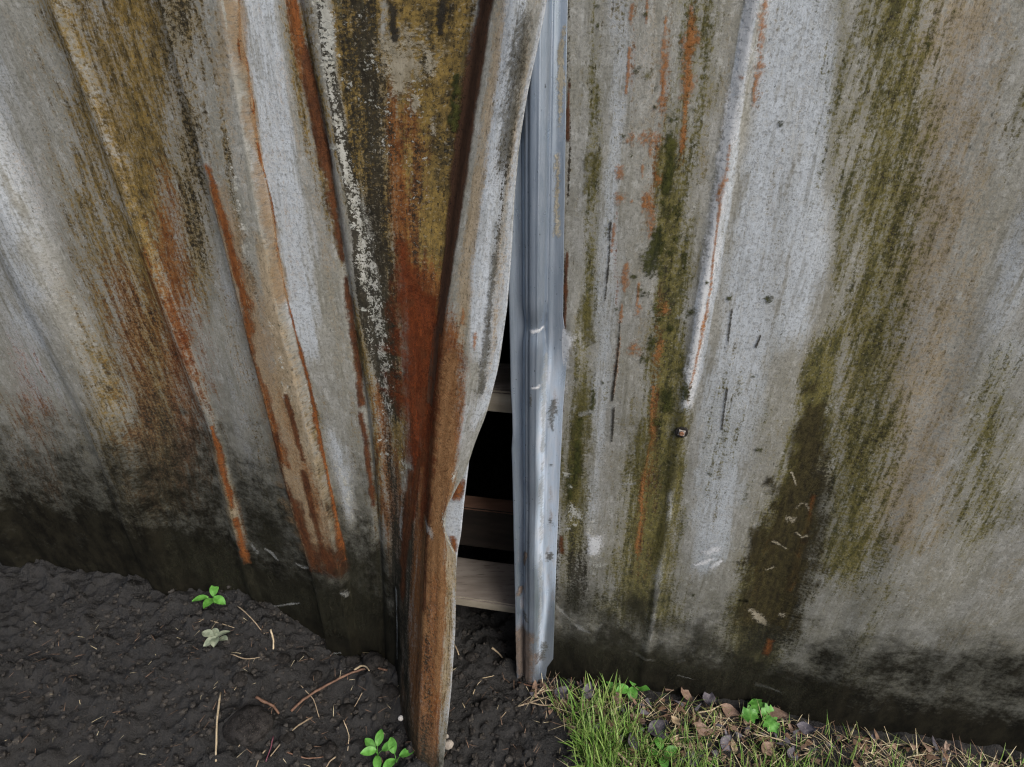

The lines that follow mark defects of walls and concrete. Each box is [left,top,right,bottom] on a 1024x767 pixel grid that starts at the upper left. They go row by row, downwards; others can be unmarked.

water stain [386,0,400,42]
rust [658,18,668,107]
rust [680,8,700,152]
rust [205,0,350,578]
rust [344,277,375,506]
rust [385,0,494,693]
rust [690,145,731,384]
water stain [553,597,817,705]